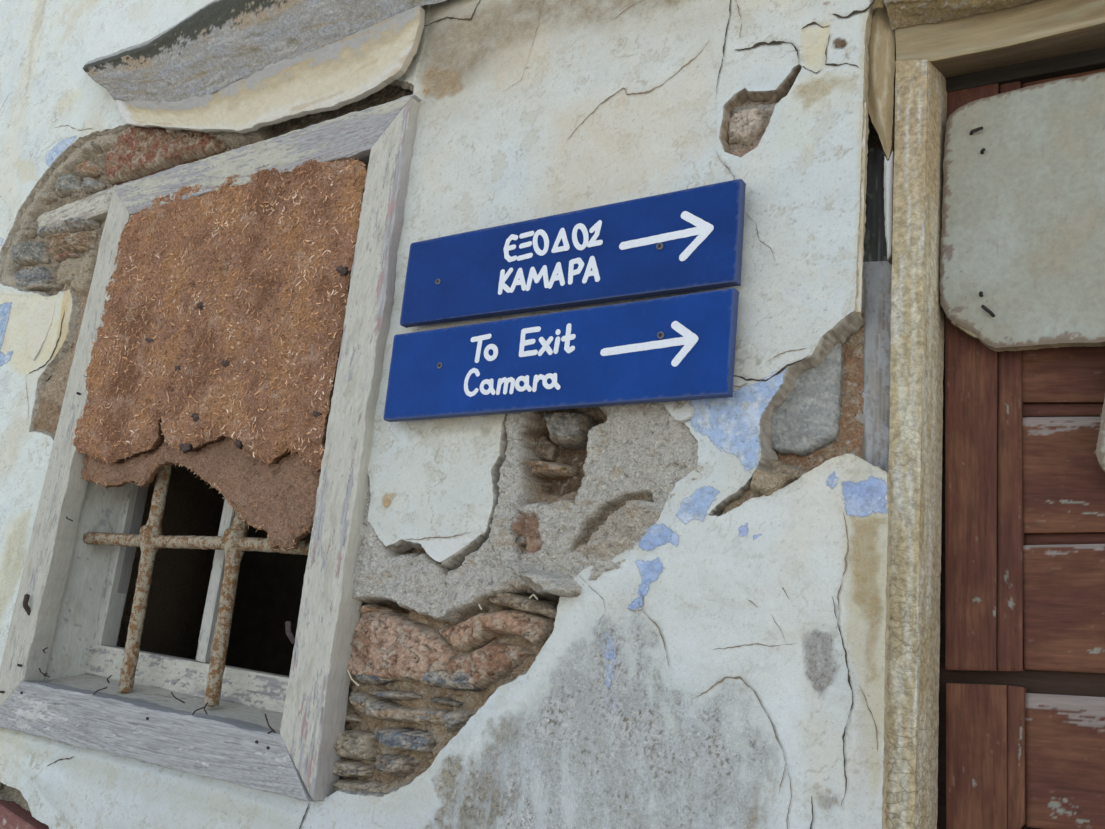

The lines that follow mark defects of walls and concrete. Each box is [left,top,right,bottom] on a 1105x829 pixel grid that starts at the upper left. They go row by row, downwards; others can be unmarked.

crack [570,0,875,137]
spalling [728,99,777,157]
spalling [0,85,413,436]
crack [734,348,810,387]
spalling [332,308,887,829]
crack [716,587,795,649]
crack [832,512,878,806]
spalling [0,783,49,829]
crack [695,676,813,829]